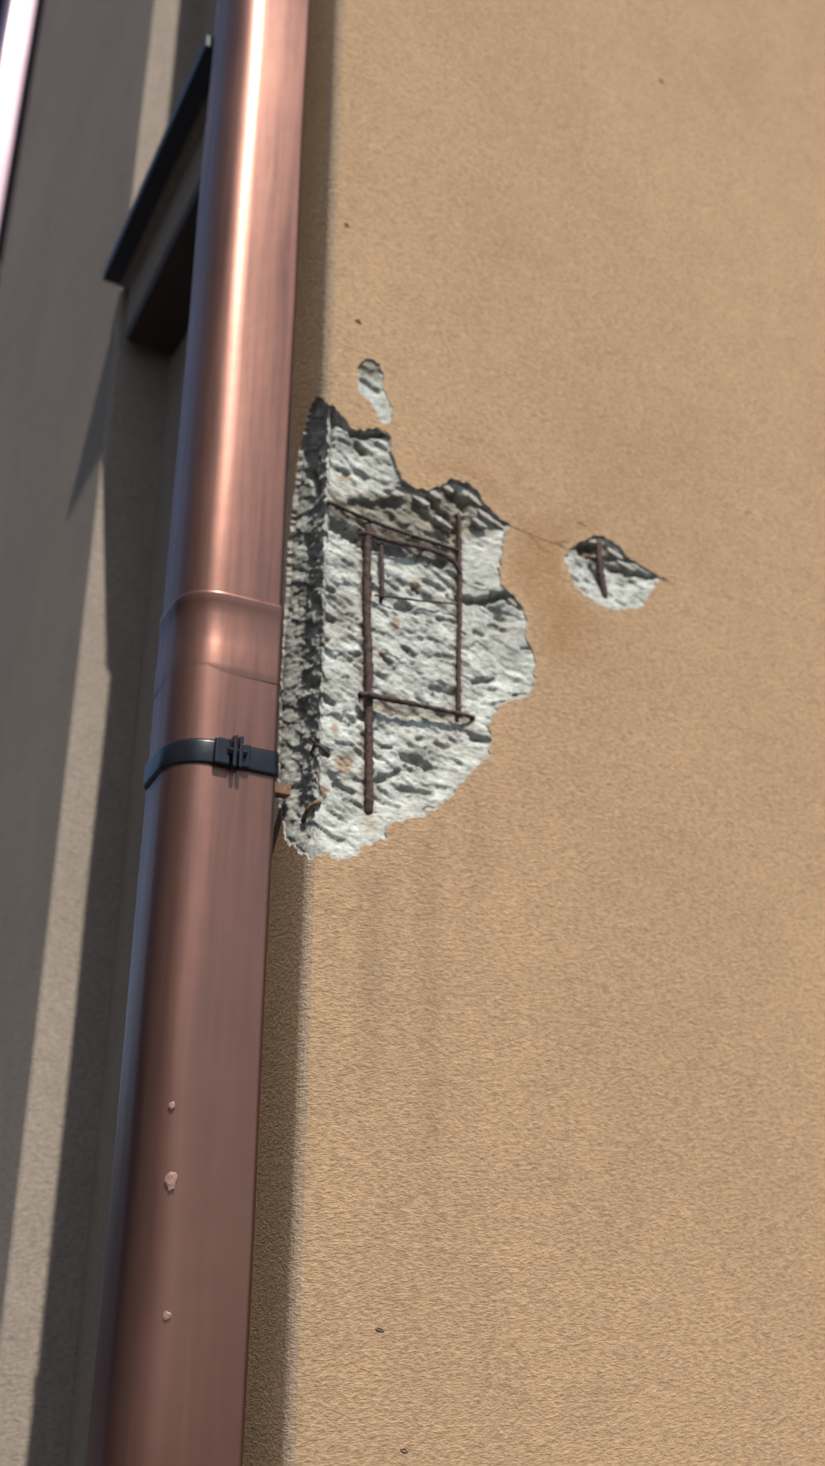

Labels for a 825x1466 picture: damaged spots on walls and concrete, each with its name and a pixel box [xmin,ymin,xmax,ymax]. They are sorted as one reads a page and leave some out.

spalling [277,358,536,861]
spalling [564,535,660,612]